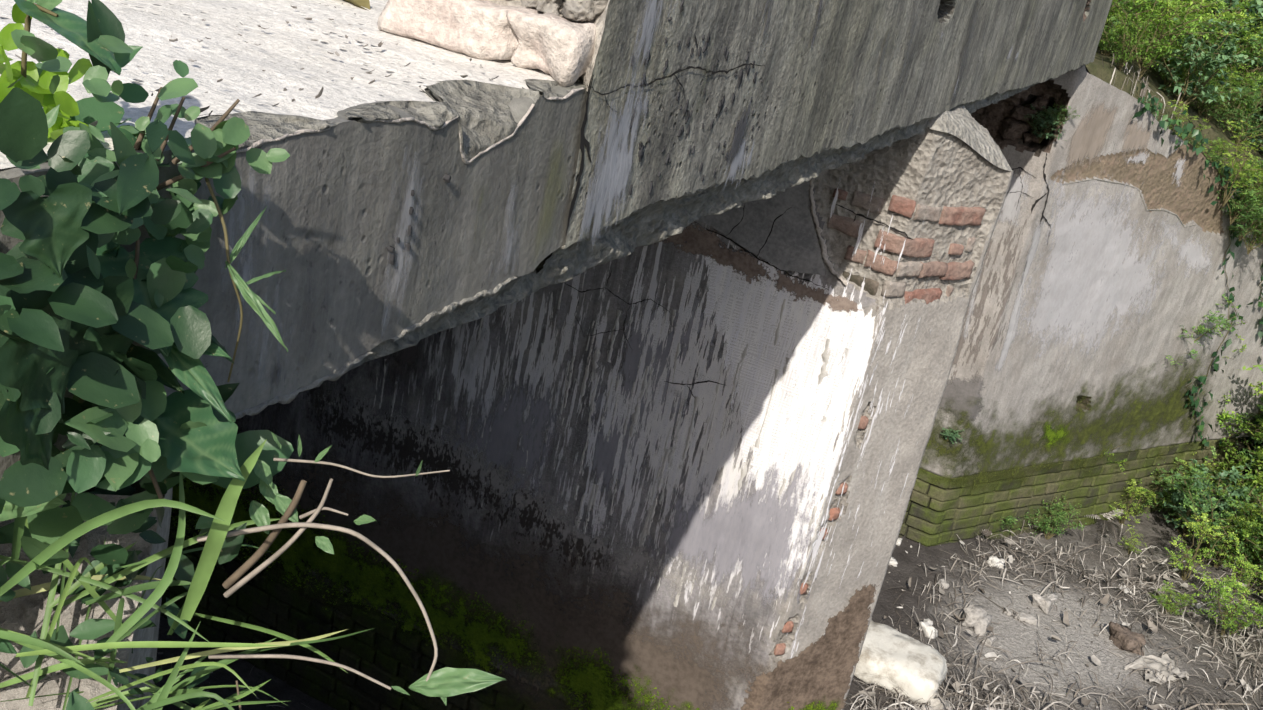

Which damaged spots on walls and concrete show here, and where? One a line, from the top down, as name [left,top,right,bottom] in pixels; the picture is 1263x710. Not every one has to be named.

water stain [387,173,414,299]
crack [566,33,766,234]
crack [694,205,828,290]
spalling [957,63,1089,157]
peeling [1050,144,1224,235]
water stain [370,329,448,388]
peeling [194,32,1012,663]
water stain [581,296,719,493]
water stain [234,379,879,710]